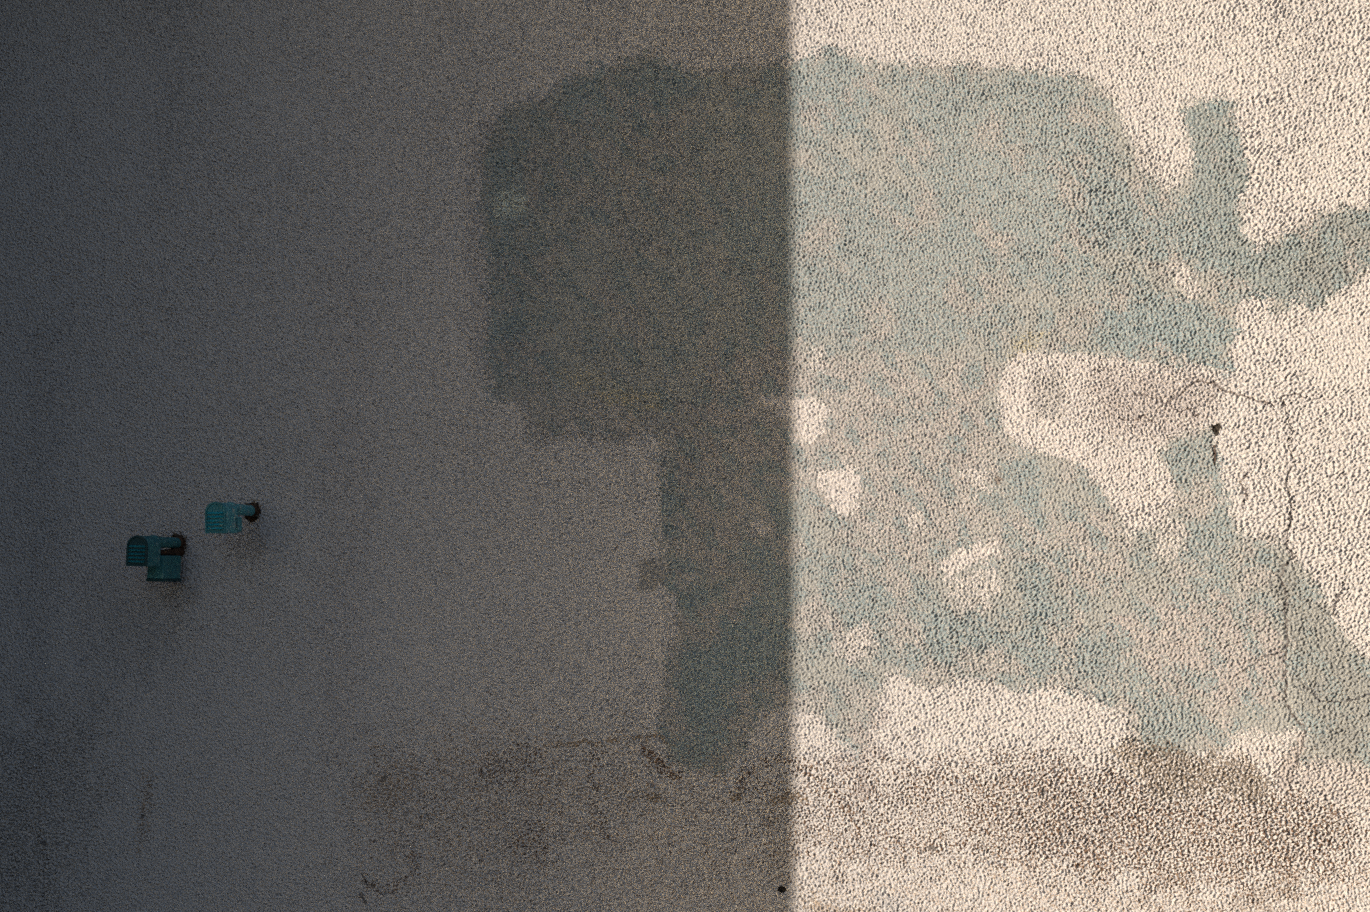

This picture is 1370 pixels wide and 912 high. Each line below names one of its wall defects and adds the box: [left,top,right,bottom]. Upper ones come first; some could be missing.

leakage [1244,0,1370,174]
crack [1110,380,1370,791]
leakage [751,807,806,908]
leakage [873,888,911,912]
leakage [1218,852,1329,912]